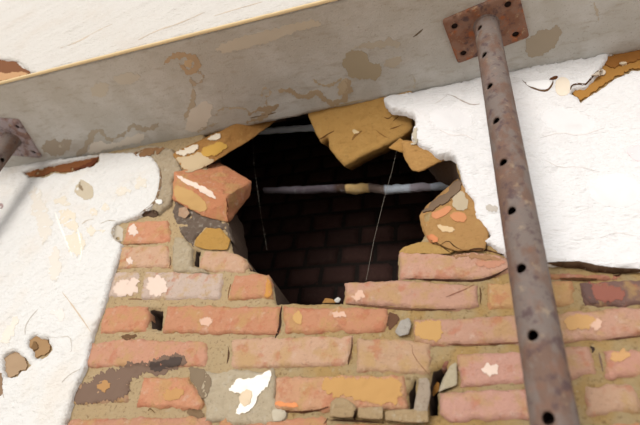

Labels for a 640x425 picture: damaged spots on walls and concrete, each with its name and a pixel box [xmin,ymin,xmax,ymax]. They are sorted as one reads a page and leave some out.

flaking render [0,60,31,81]
leakage [184,37,402,133]
crack [522,80,553,92]
crack [570,71,598,90]
leakage [41,123,159,157]
spalling [176,144,216,199]
leakage [201,142,227,157]
flaking render [384,77,506,258]
flaking render [509,50,640,273]
flaking render [0,147,165,425]
spalling [386,312,399,330]
flaking render [229,370,272,415]